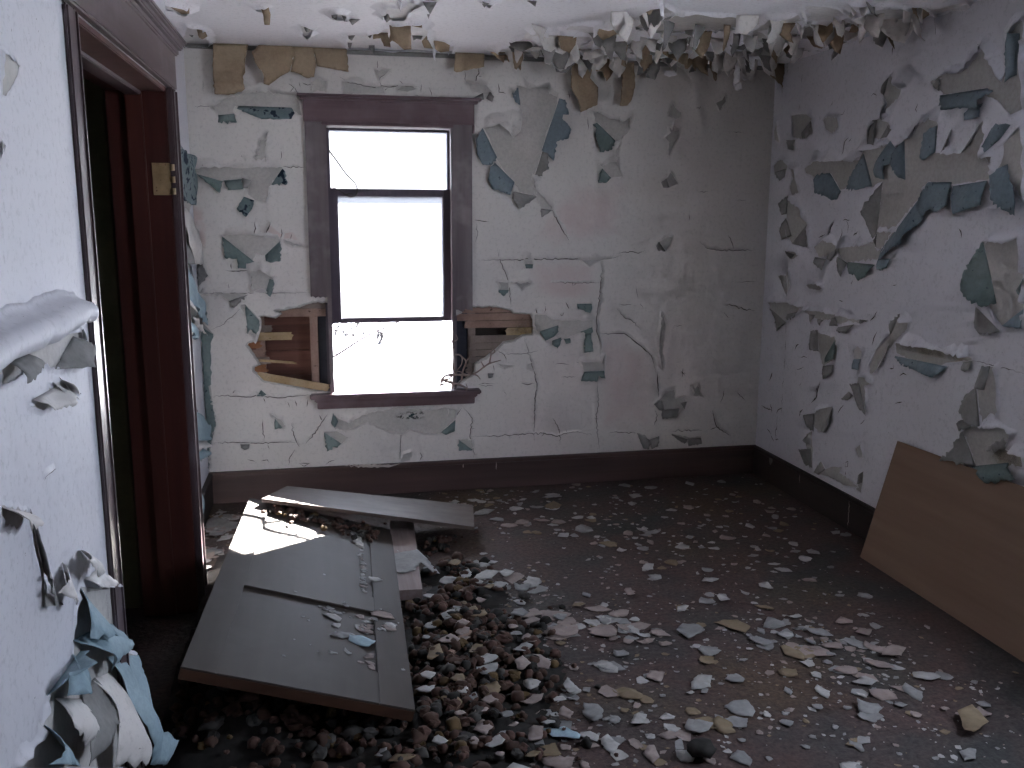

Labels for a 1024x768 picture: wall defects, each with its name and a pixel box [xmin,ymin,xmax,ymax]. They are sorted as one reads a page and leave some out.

peeling [0,326,97,417]
spalling [180,75,330,472]
peeling [290,0,461,59]
peeling [341,66,418,95]
peeling [323,404,476,452]
crack [447,337,599,455]
spalling [456,258,607,386]
crack [476,209,685,425]
peeling [463,0,975,217]
peeling [766,11,1024,379]
peeling [798,310,1024,484]
peeling [0,499,179,768]